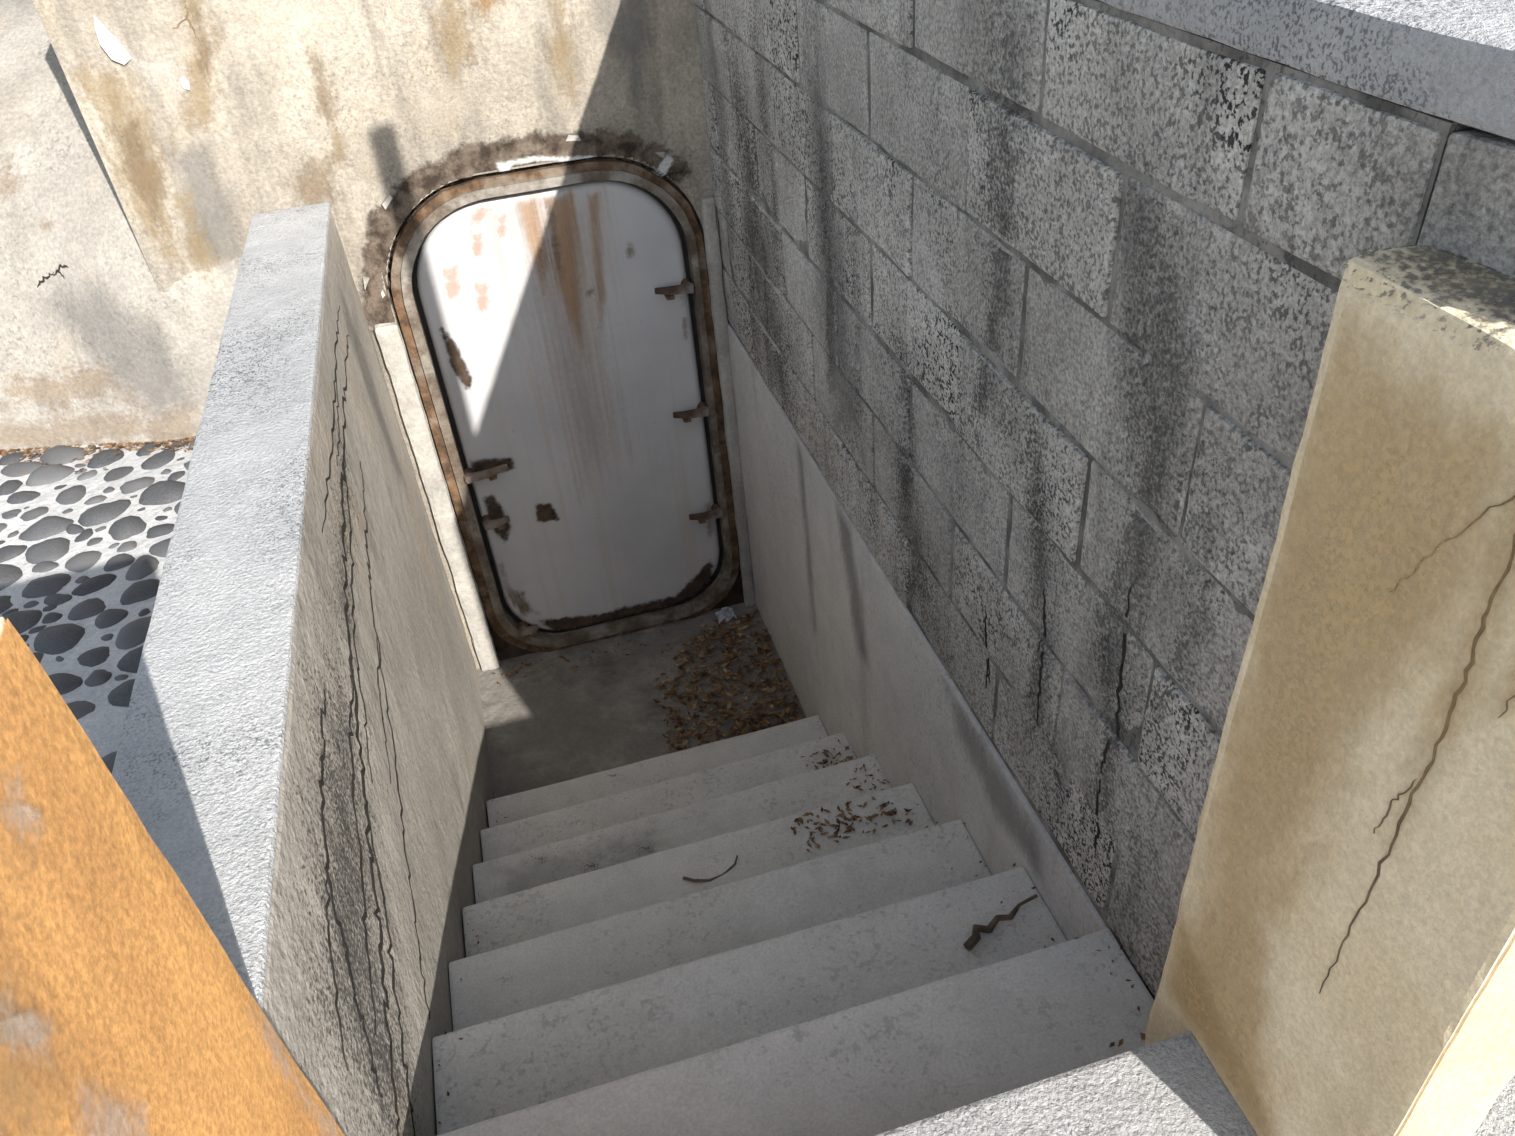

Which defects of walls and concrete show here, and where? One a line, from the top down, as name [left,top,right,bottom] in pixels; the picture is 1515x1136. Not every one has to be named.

peeling [94,15,132,65]
crack [172,0,197,38]
crack [37,264,68,288]
rust [440,328,472,387]
rust [471,458,514,472]
rust [484,496,511,540]
rust [536,503,559,522]
rust [544,562,713,631]
crack [318,306,430,1136]
crack [1319,495,1515,993]